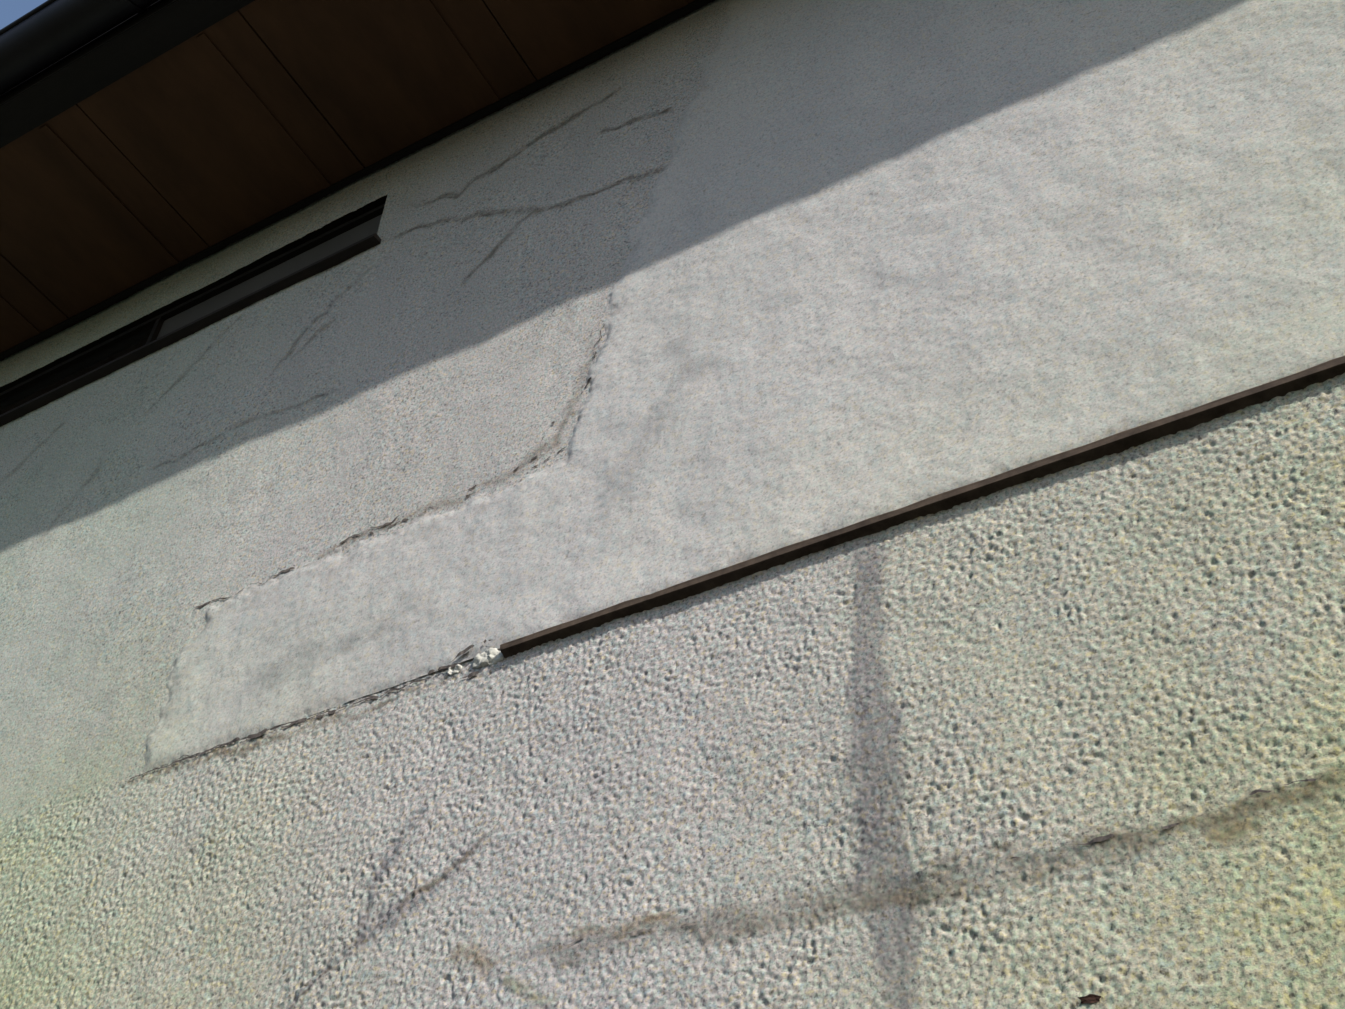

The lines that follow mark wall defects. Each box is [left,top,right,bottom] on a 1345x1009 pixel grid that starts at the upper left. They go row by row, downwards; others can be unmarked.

crack [387,89,670,283]
crack [192,326,604,609]
crack [130,662,462,780]
damp [821,549,963,967]
damp [996,834,1141,864]
damp [1158,769,1343,831]
crack [288,852,469,1009]